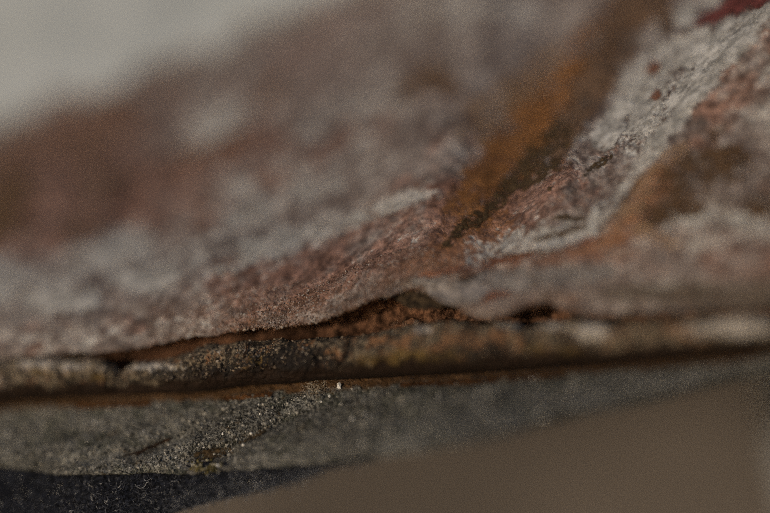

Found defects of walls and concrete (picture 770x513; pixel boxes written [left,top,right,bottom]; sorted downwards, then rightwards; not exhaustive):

rust [419,235,599,279]
peeling [424,281,491,305]